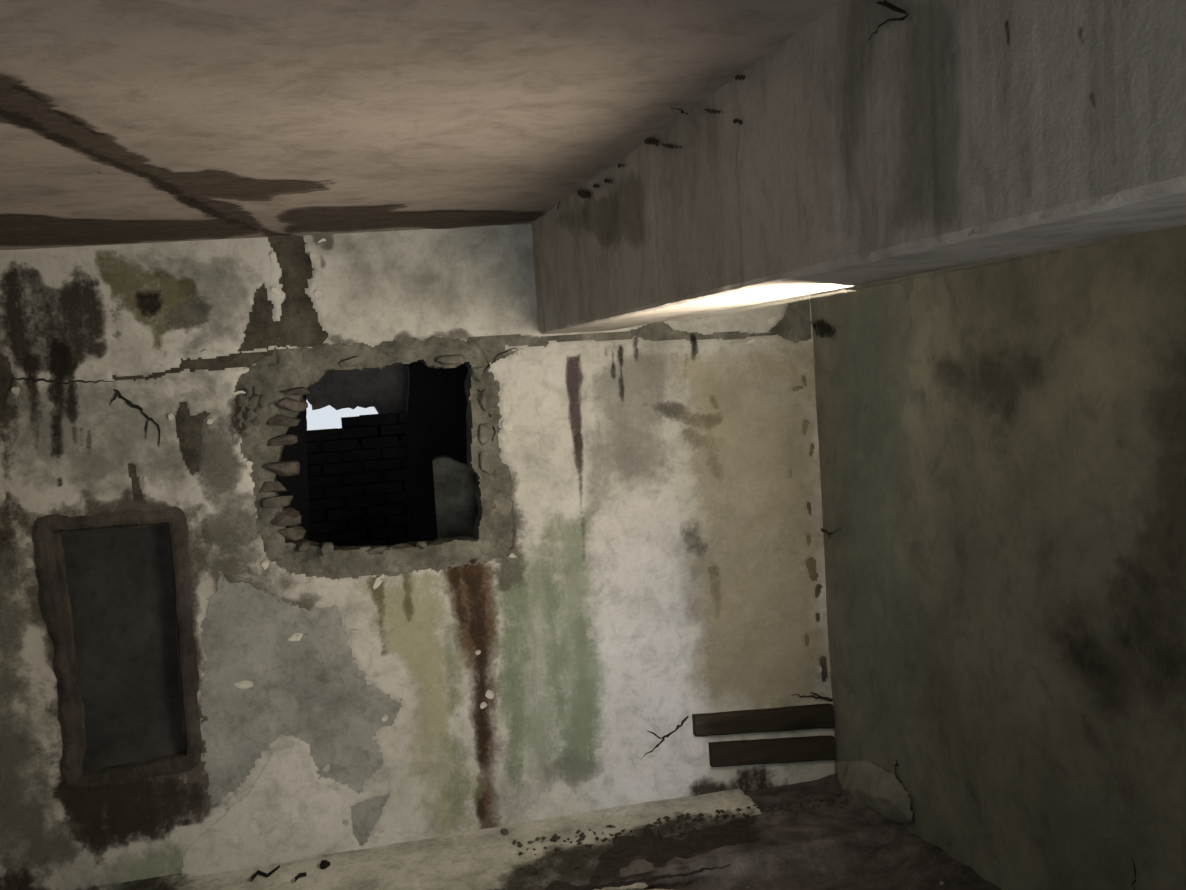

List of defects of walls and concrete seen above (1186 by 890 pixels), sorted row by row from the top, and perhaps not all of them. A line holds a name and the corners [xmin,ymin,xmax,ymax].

crack [868,0,909,40]
leakage [0,77,546,458]
crack [15,377,160,446]
leakage [0,491,219,890]
leakage [184,386,316,683]
peeling [199,571,403,847]
spalling [112,236,811,590]
corrosion [444,560,508,829]
leakage [489,478,523,587]
corrosion [566,356,583,490]
crack [643,716,689,757]
spalling [801,534,822,598]